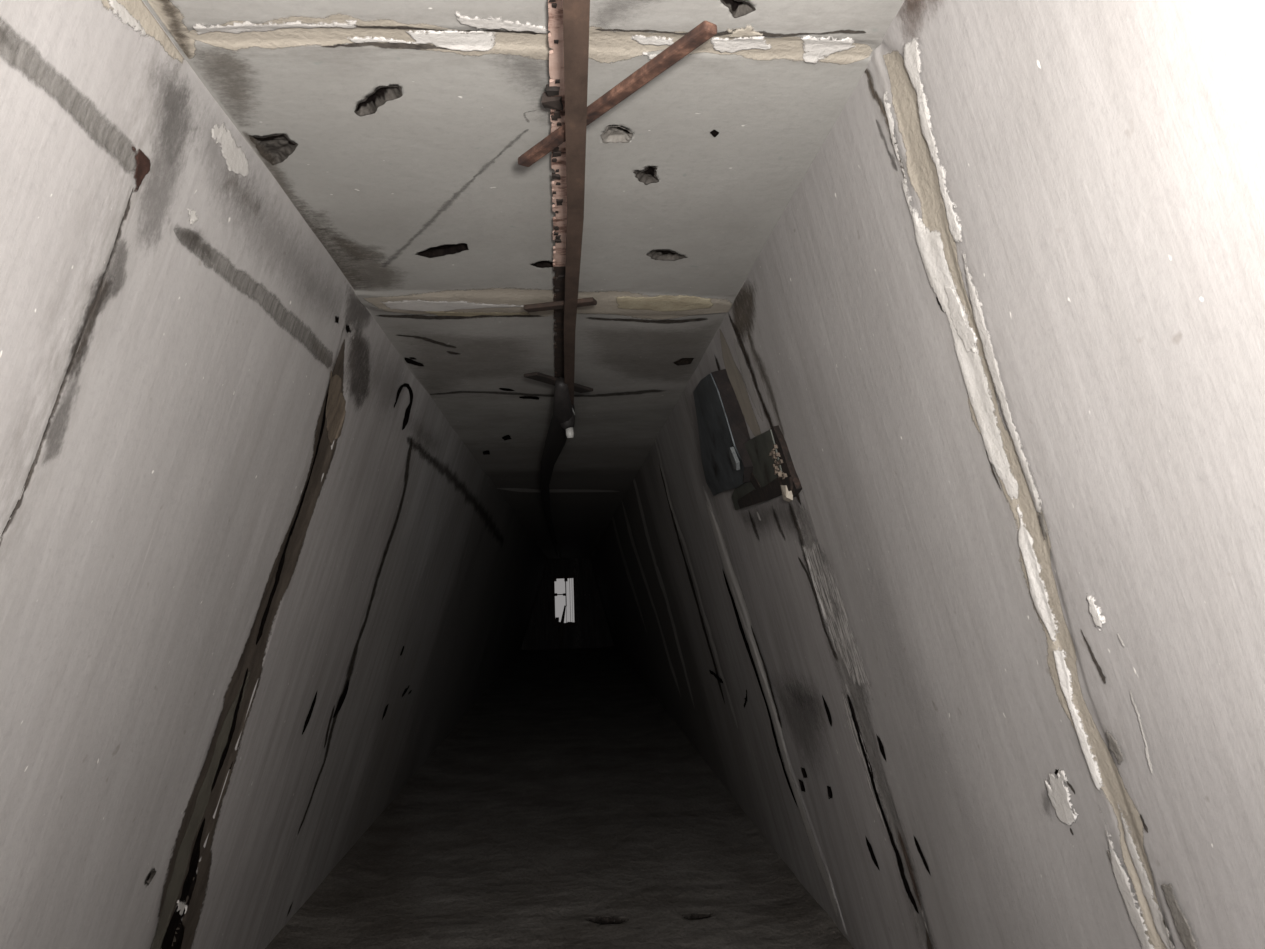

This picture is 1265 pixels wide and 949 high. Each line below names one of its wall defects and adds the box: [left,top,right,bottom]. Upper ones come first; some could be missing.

peeling [631,35,674,59]
peeling [711,0,772,53]
peeling [801,35,855,64]
crack [0,189,133,544]
peeling [883,39,1106,790]
crack [184,376,333,898]
crack [298,335,662,834]
peeling [1045,769,1078,835]
peeling [1105,804,1197,949]